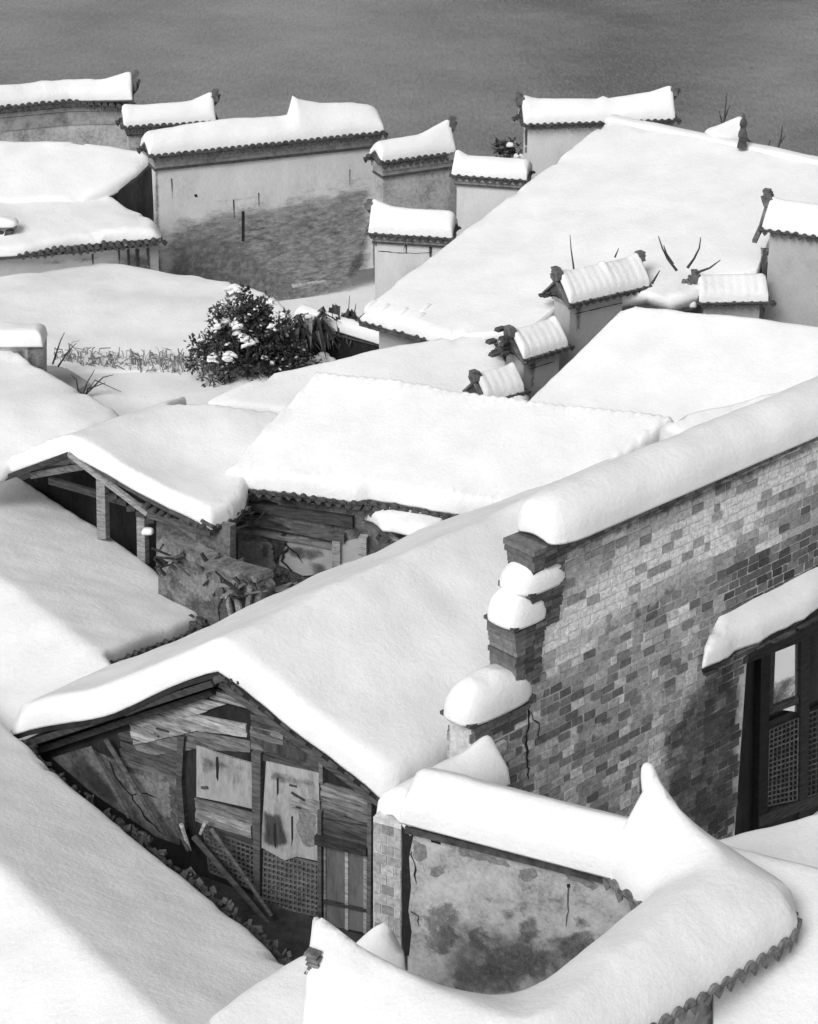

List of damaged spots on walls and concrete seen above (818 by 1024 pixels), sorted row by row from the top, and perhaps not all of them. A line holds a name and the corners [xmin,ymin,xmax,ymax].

water stain [349,243,377,276]
crack [524,709,540,779]
crack [109,761,160,832]
crack [402,828,419,956]
water stain [424,904,594,992]